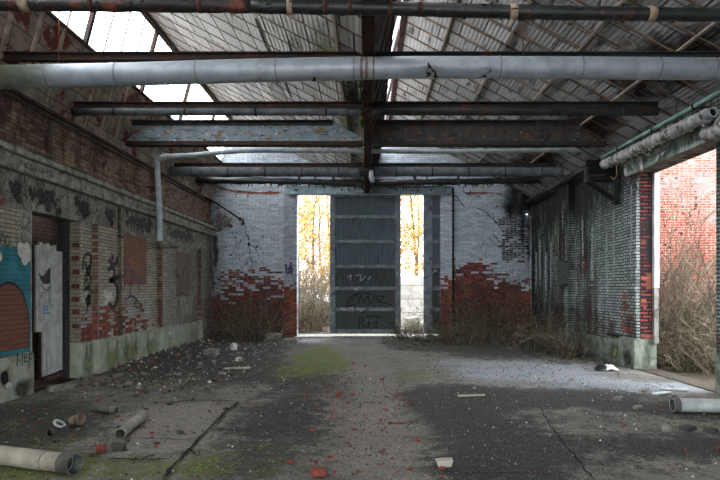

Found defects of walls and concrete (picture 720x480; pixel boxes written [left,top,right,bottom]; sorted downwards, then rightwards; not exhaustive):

peeling [71,284,172,342]
crack [230,219,259,269]
peeling [212,228,297,337]
peeling [440,208,531,336]
crack [108,390,261,477]
crack [540,407,593,478]